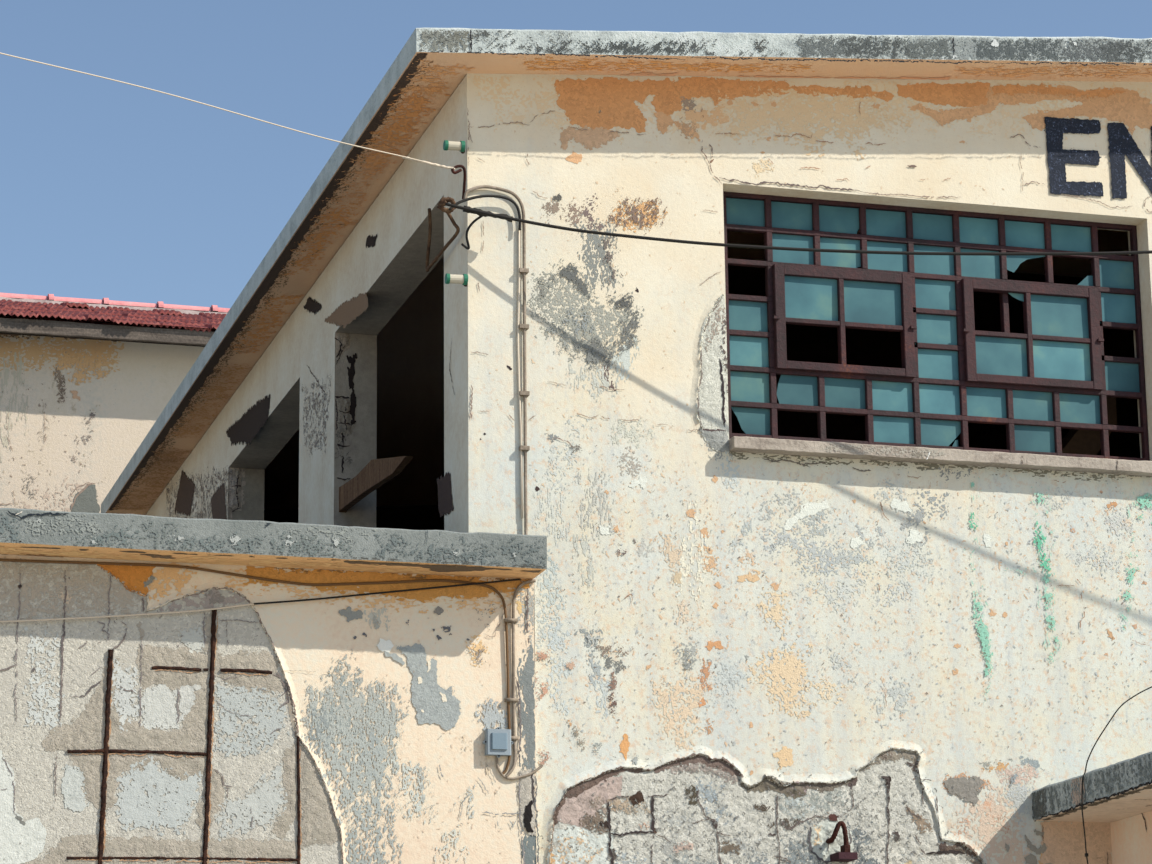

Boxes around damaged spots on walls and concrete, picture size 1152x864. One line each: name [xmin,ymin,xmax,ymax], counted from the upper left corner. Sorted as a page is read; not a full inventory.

peeling [541,193,668,233]
peeling [49,340,113,401]
spalling [695,294,730,453]
crack [0,477,90,519]
crack [0,573,21,720]
crack [1,757,22,822]
corrosion [75,616,302,864]
crack [54,563,343,862]
spalling [0,561,532,864]
spalling [518,641,1052,864]
crack [768,760,982,864]